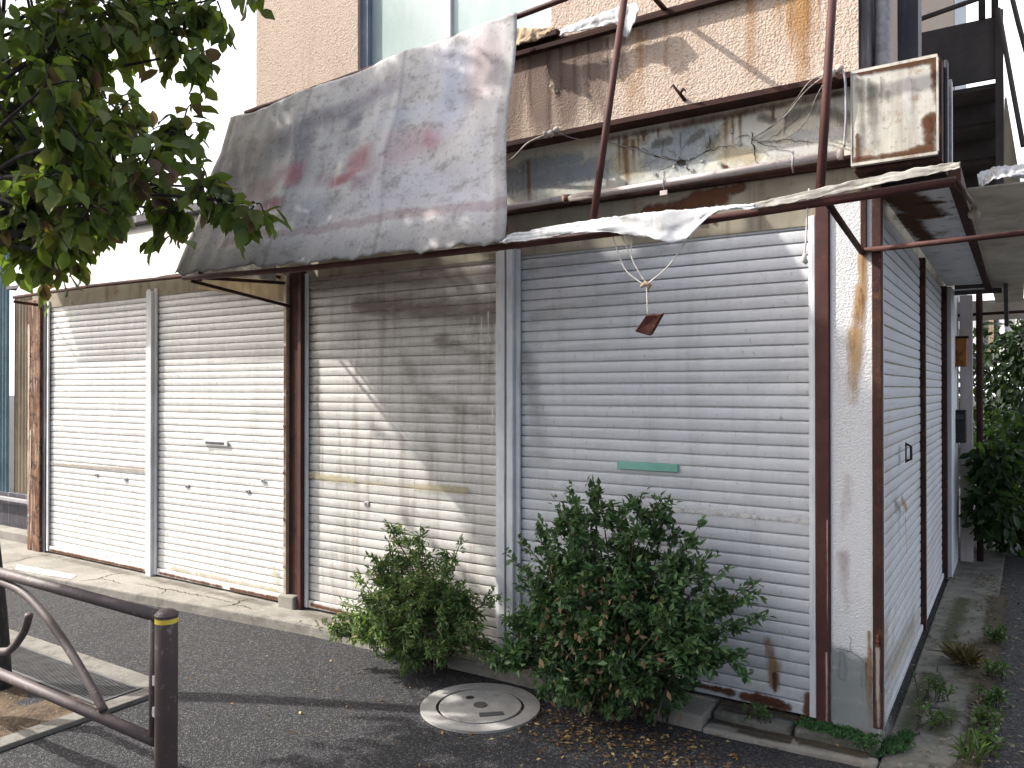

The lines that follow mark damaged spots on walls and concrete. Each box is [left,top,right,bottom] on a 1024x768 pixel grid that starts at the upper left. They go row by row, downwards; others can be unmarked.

corrosion [789,0,818,63]
crack [617,117,812,173]
corrosion [853,57,940,162]
corrosion [641,182,746,225]
corrosion [849,254,866,388]
corrosion [678,638,810,717]